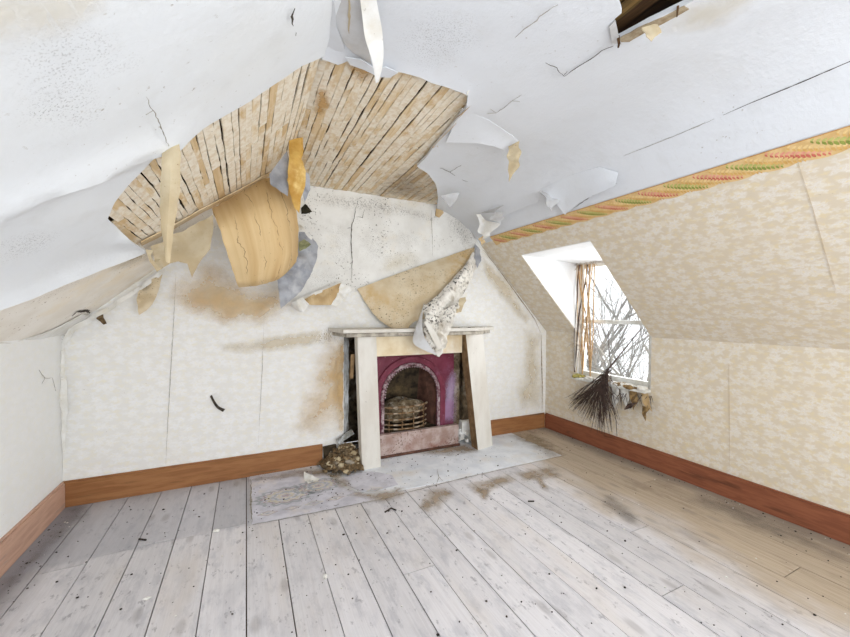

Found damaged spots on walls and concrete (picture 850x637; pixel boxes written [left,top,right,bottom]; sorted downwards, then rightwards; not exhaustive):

peeling [328,0,398,83]
crack [546,46,613,77]
crack [624,61,850,156]
peeling [435,192,460,218]
water stain [189,285,276,317]
water stain [320,346,344,409]